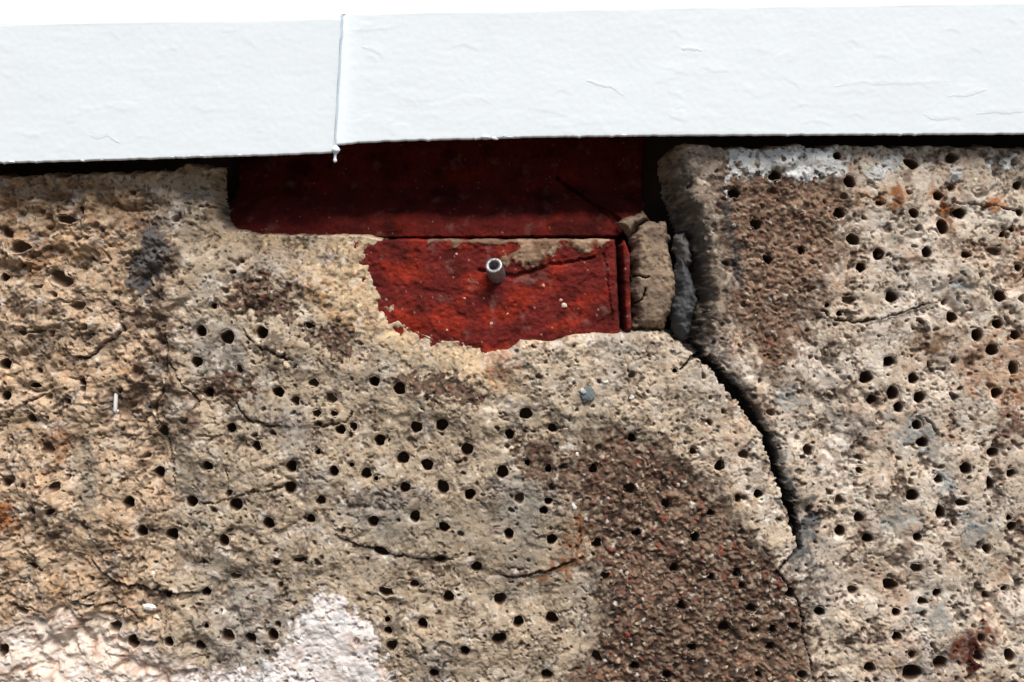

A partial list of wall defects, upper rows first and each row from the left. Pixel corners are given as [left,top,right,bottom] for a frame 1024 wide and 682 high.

spalling [228,132,649,353]
crack [821,300,939,323]
crack [670,187,812,670]
crack [503,524,582,578]